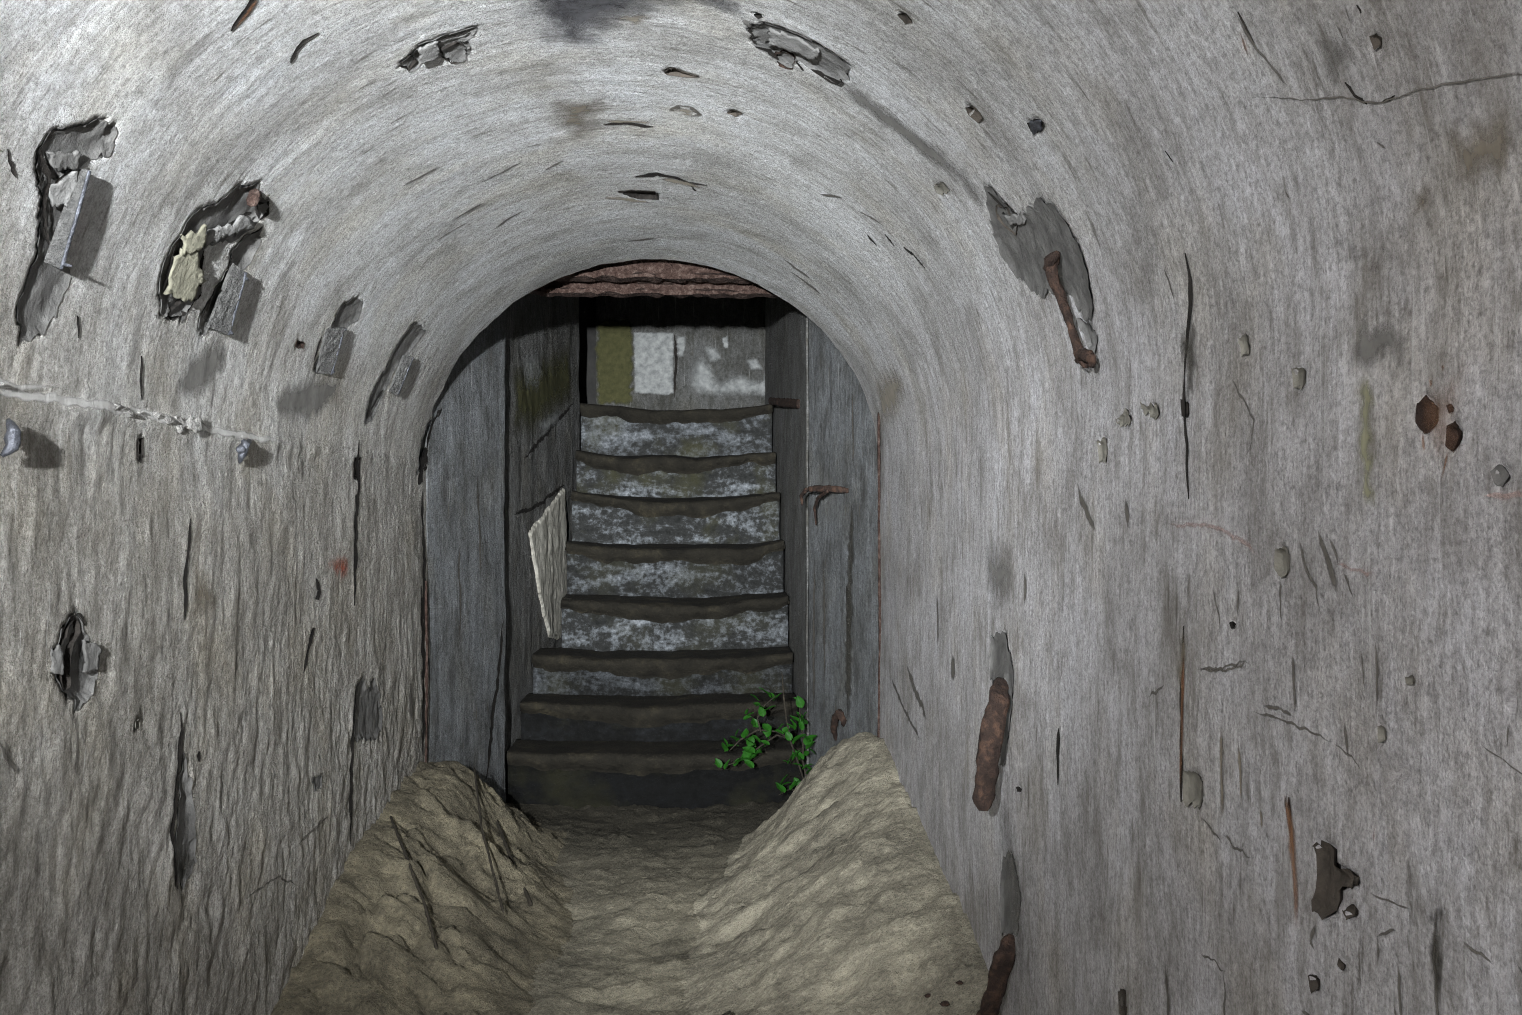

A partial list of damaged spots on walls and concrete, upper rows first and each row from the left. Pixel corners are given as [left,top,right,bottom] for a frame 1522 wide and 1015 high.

spalling [400,27,477,73]
spalling [746,23,850,87]
crack [1263,73,1522,104]
spalling [16,118,118,345]
spalling [157,183,269,336]
spalling [983,185,1098,354]
rust [1043,250,1097,368]
rust [972,677,1010,811]
spalling [1310,840,1359,949]
rust [976,934,1016,1015]
spalling [1308,974,1320,993]